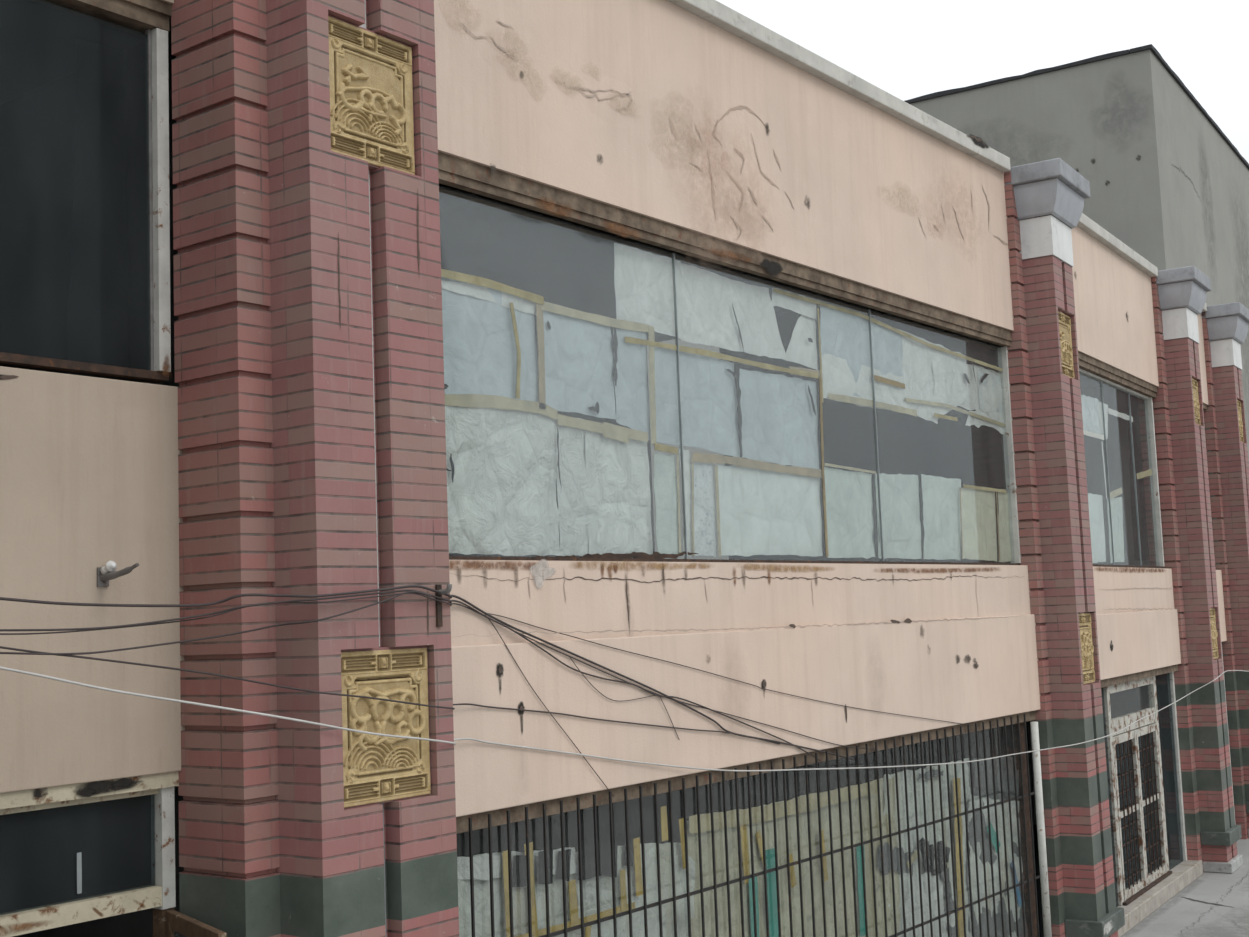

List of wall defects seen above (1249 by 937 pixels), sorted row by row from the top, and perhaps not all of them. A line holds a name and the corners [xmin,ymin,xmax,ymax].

corrosion [450,561,535,584]
corrosion [578,562,706,584]
corrosion [734,565,822,584]